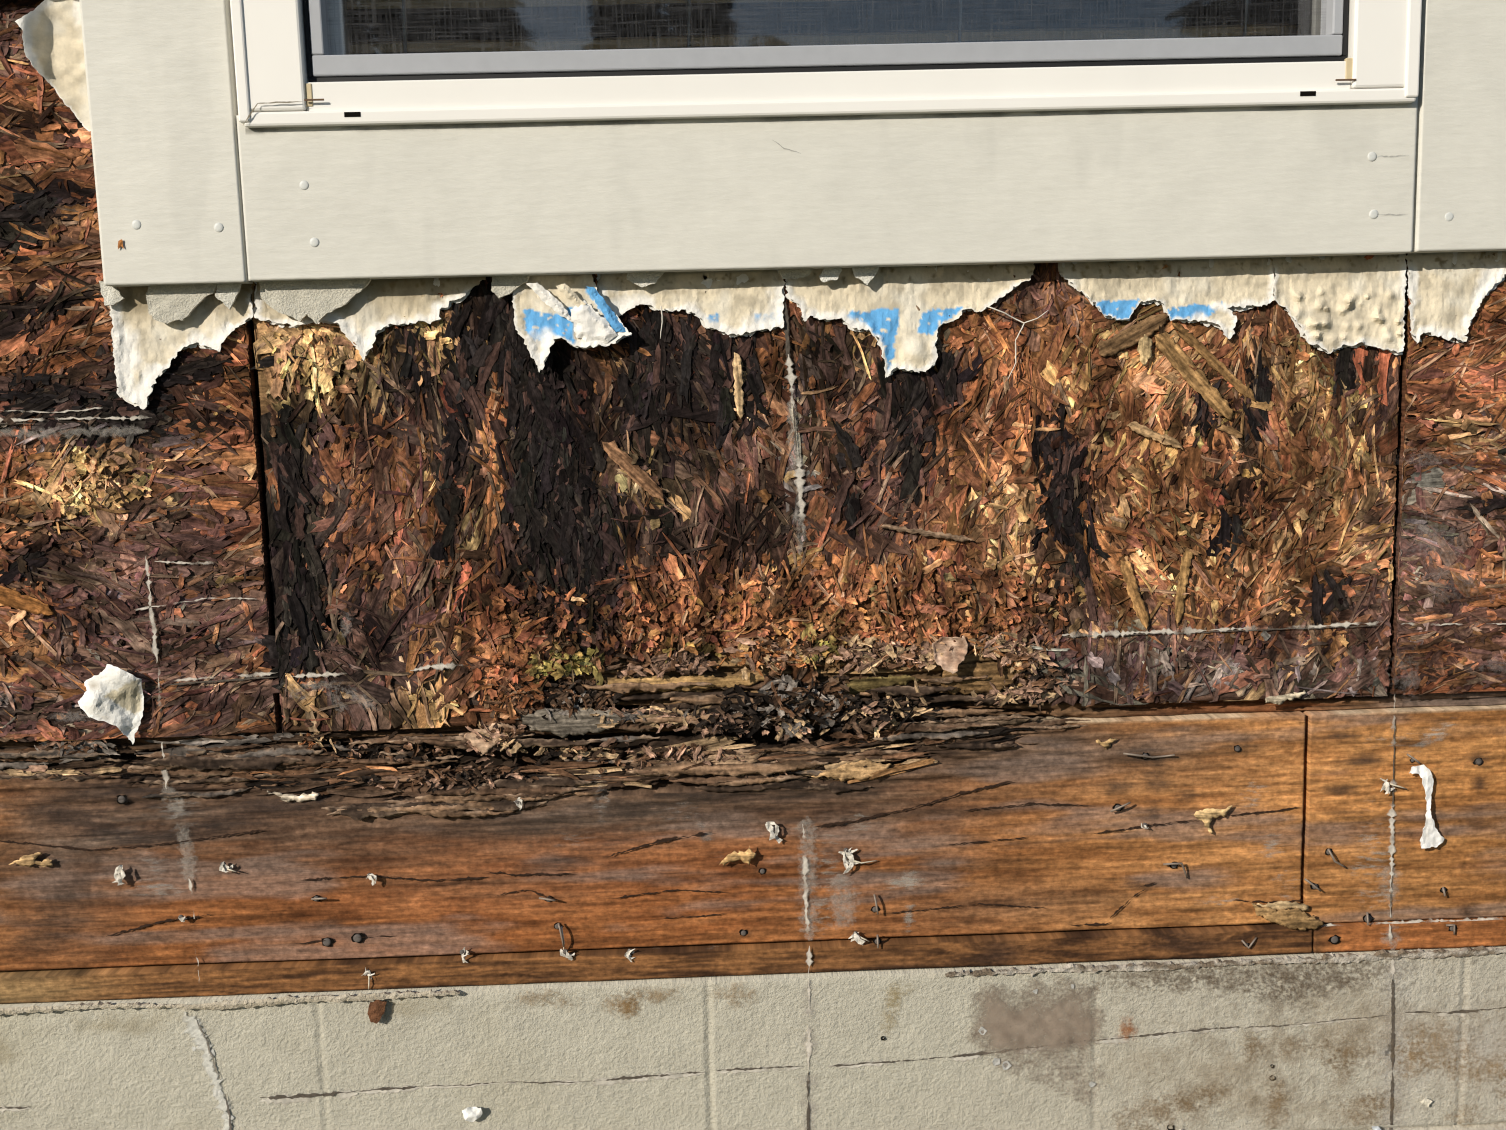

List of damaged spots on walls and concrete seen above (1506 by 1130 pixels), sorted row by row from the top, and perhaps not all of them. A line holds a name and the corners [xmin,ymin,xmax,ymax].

flaking render [99,281,125,306]
flaking render [146,283,241,324]
flaking render [259,279,372,324]
flaking render [491,275,530,299]
flaking render [627,272,665,287]
flaking render [778,267,879,285]
water stain [390,283,619,661]
water stain [617,306,768,451]
water stain [877,347,983,506]
water stain [1031,398,1111,621]
water stain [1206,475,1246,572]
water stain [1240,350,1272,446]